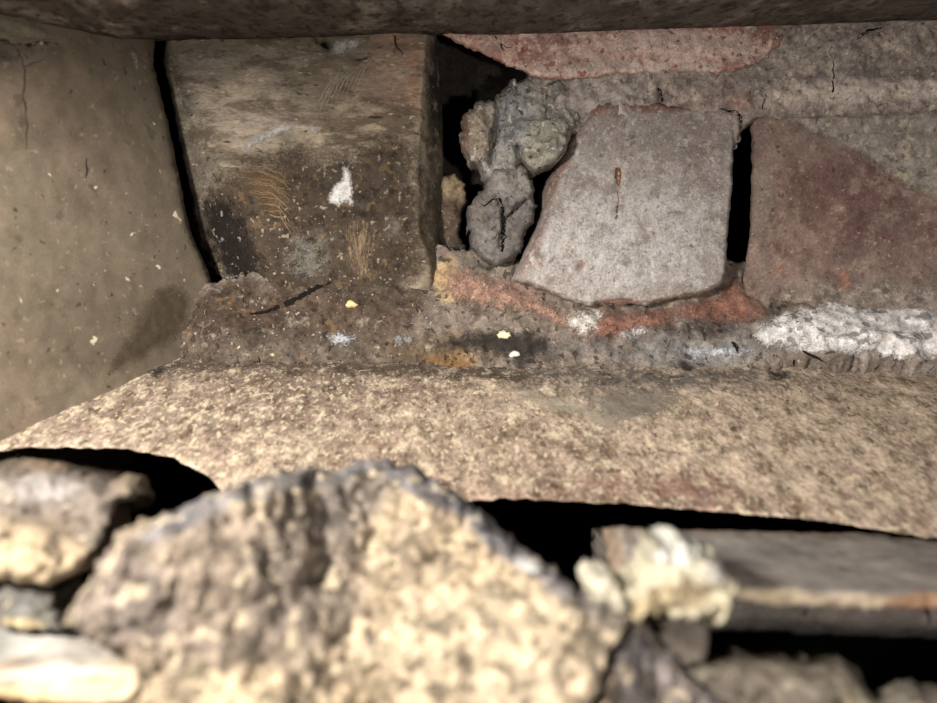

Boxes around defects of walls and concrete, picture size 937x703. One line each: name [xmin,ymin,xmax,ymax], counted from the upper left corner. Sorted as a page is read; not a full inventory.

crack [17,49,46,149]
crack [480,195,524,252]